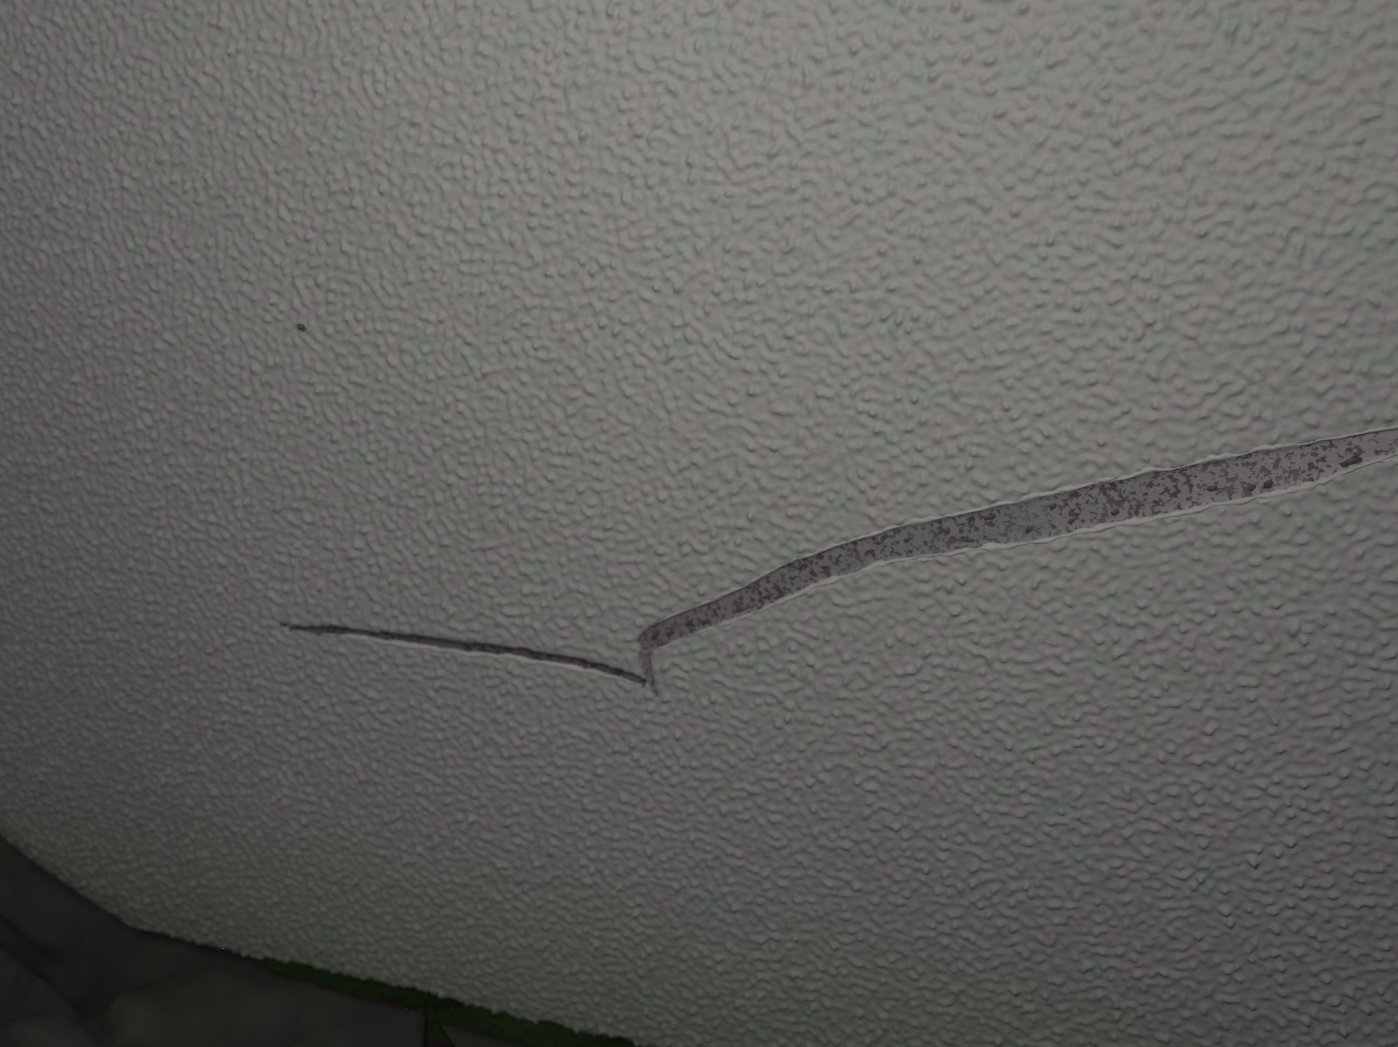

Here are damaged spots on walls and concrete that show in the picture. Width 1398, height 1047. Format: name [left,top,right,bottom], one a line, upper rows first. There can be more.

crack [279,623,659,697]